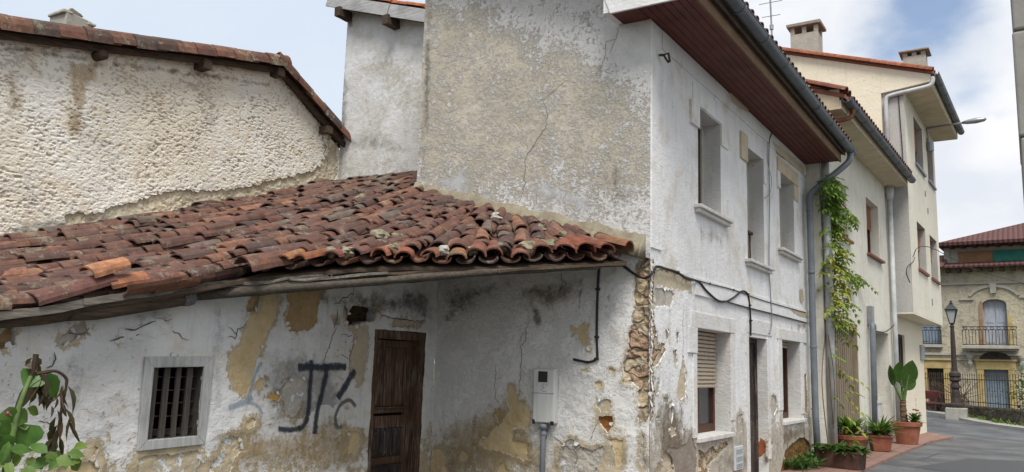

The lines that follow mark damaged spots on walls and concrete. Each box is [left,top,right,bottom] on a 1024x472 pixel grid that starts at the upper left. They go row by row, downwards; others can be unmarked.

crack [519,86,559,204]
flaking render [227,290,325,417]
flaking render [570,325,591,352]
flaking render [609,258,692,472]
flaking render [478,385,531,472]
flaking render [558,369,623,472]
flaking render [698,442,727,472]